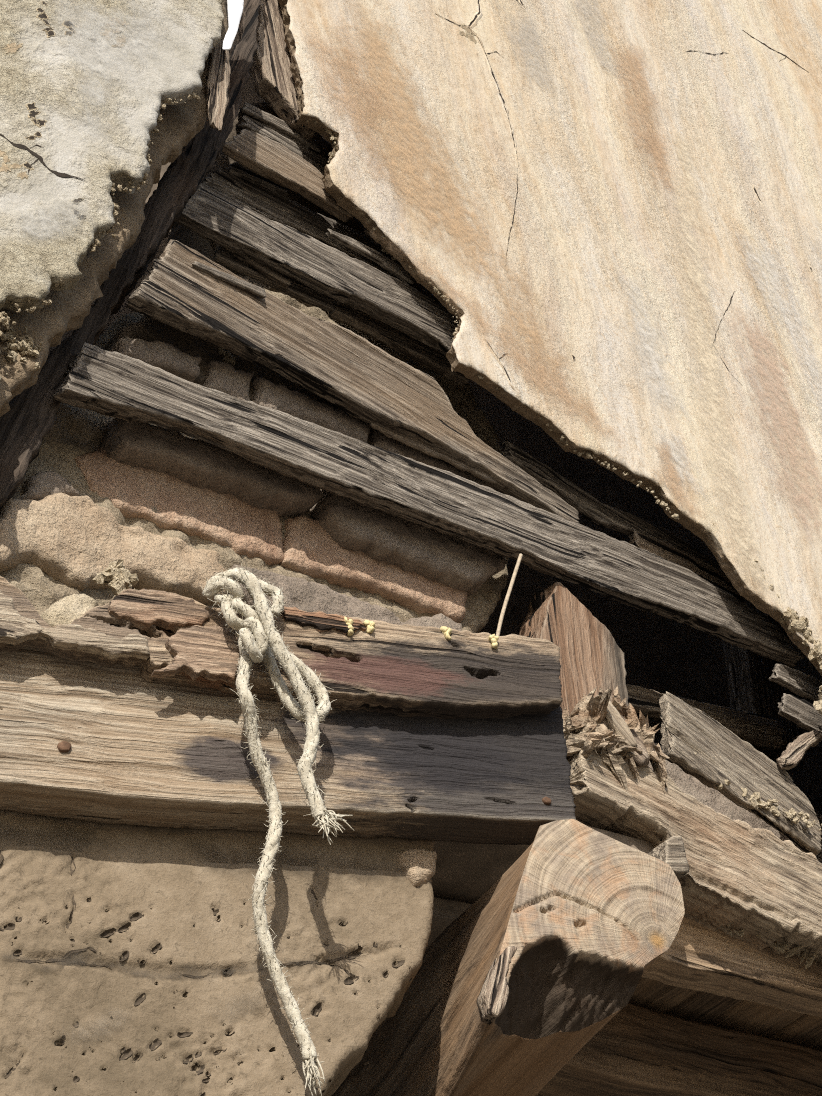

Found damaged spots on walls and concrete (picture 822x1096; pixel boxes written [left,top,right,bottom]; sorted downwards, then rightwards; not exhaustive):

spalling [35,1,129,48]
crack [743,30,809,73]
spalling [25,102,47,140]
crack [435,0,519,256]
crack [0,134,88,182]
spalling [90,92,201,252]
spalling [0,298,52,376]
spalling [539,417,679,520]
spalling [746,551,822,672]
spalling [813,685,822,715]
spalling [0,907,22,956]
spalling [100,908,162,966]